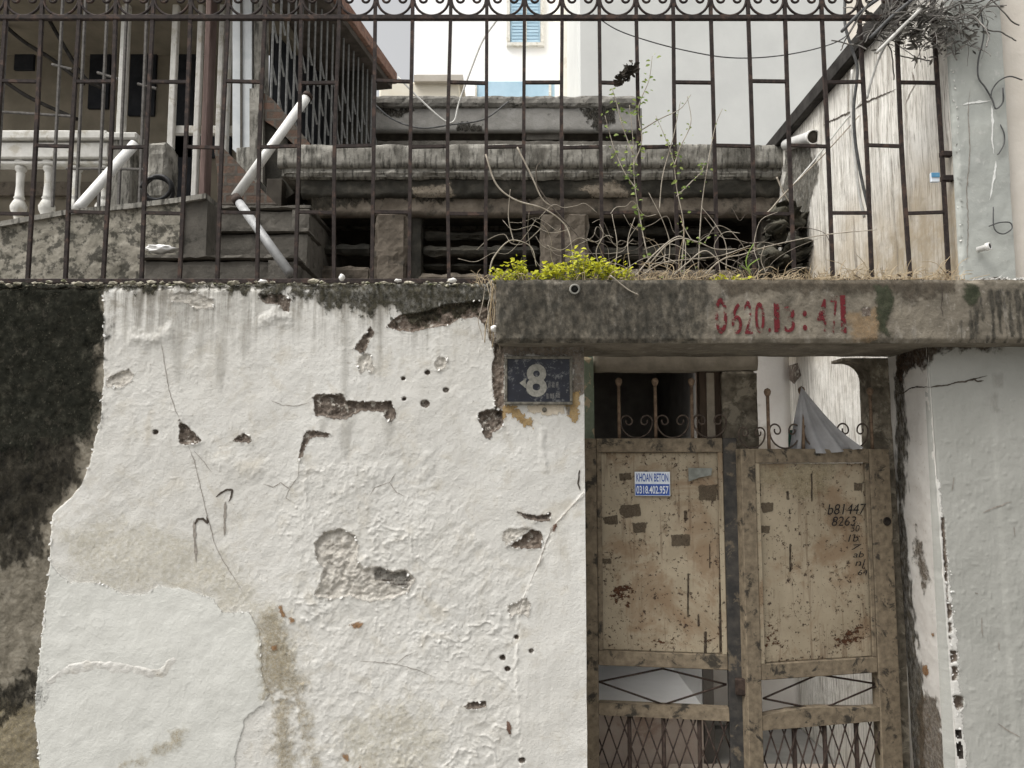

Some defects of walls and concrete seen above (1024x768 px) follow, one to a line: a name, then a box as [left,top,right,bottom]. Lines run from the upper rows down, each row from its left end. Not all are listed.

leakage [0,282,110,571]
flaking render [178,419,201,445]
flaking render [312,393,396,422]
flaking render [386,300,581,440]
crack [897,376,985,394]
crack [188,446,240,587]
flaking render [313,528,415,602]
flaking render [502,511,551,549]
crack [519,470,584,612]
leakage [493,279,1024,768]
peeling [935,477,967,768]
leakage [0,668,42,768]